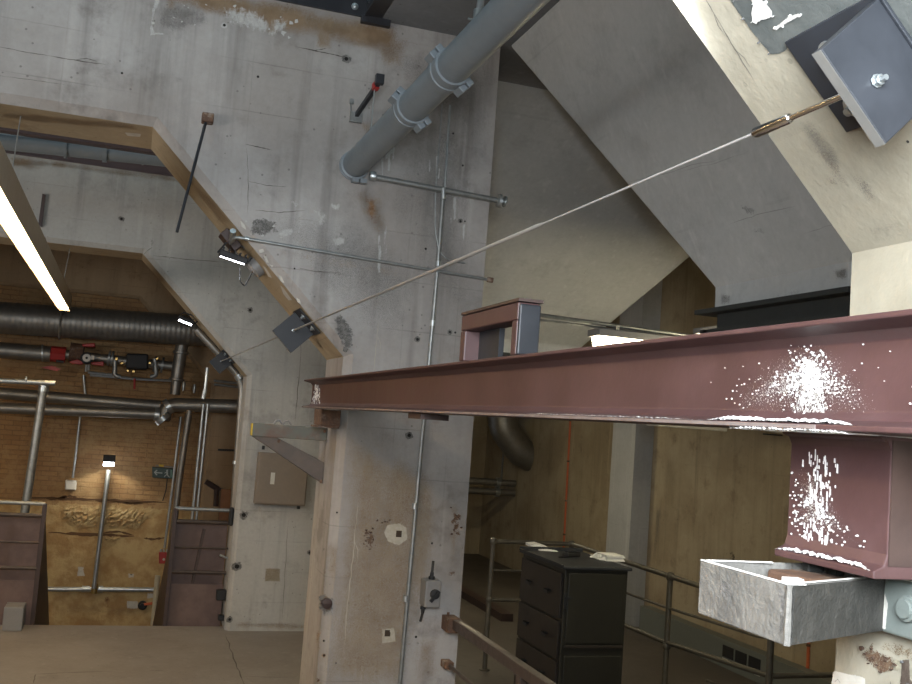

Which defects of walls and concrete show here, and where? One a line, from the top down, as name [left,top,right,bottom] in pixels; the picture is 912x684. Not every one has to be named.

peeling [730,0,860,55]
peeling [887,0,912,38]